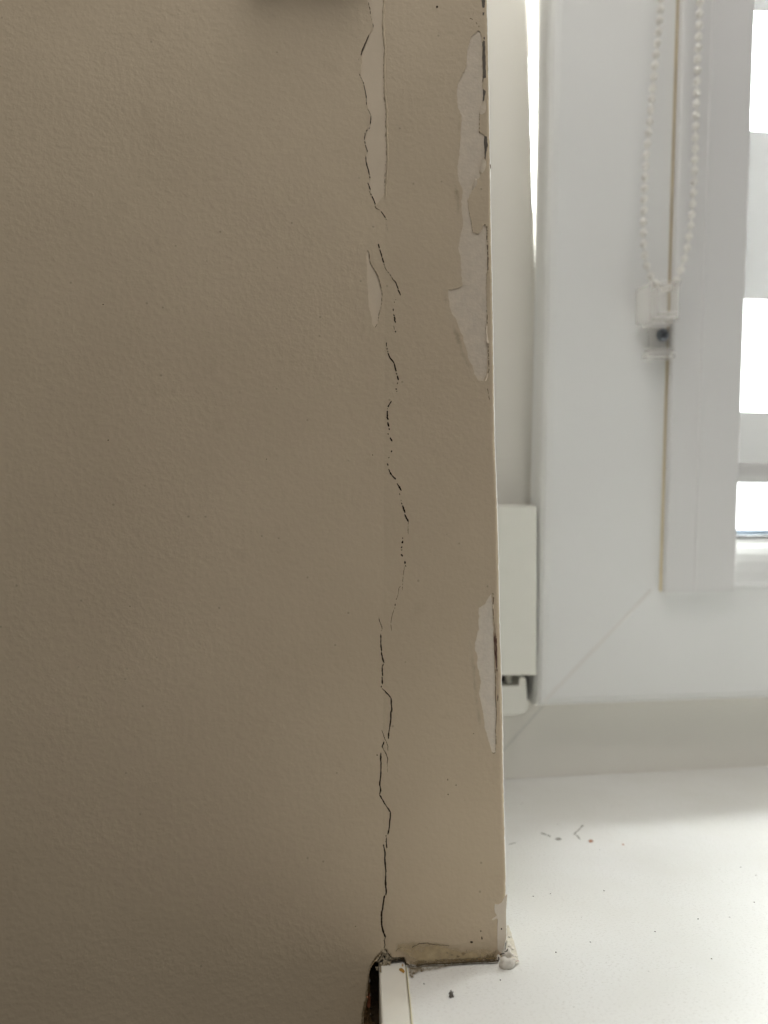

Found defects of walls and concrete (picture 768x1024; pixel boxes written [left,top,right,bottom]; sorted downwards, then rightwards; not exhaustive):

peeling [361,0,389,205]
peeling [448,0,491,400]
crack [358,2,446,951]
peeling [475,593,497,754]